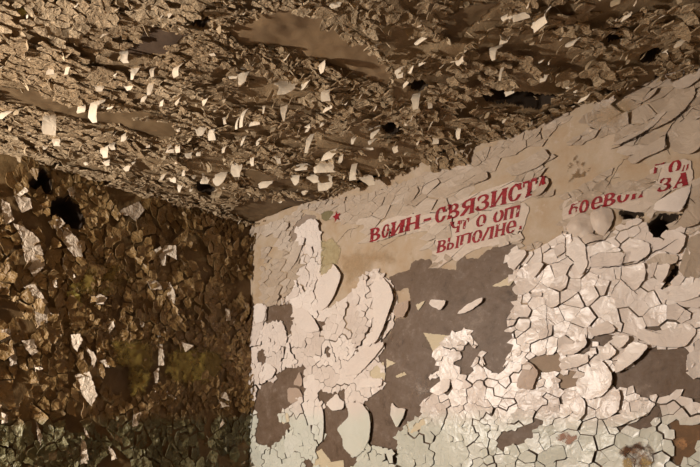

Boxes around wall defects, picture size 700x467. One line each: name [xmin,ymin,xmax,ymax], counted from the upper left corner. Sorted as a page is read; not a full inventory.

peeling [0,86,382,467]
peeling [0,0,604,187]
flaking render [190,1,700,467]
crack [548,231,611,268]
crack [602,185,695,294]
crack [607,97,694,186]